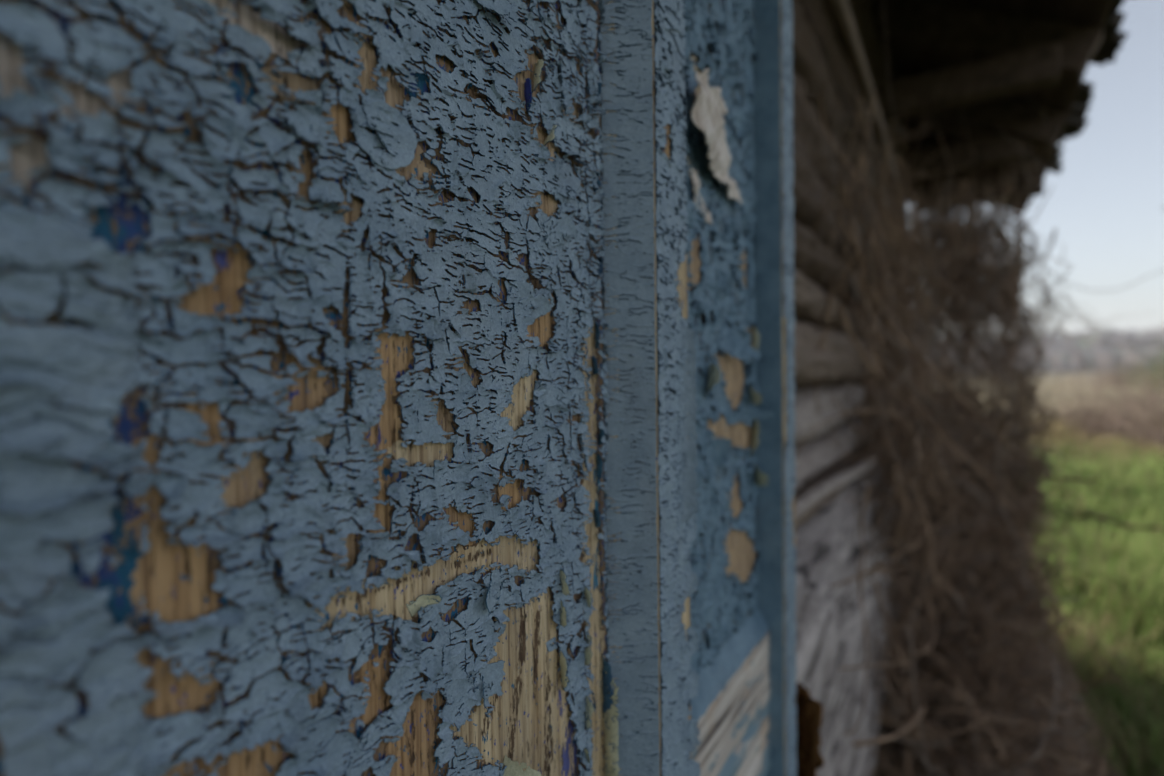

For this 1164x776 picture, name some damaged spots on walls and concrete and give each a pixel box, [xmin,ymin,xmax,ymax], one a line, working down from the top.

peeling [0,27,150,188]
peeling [75,185,276,322]
crack [175,153,279,214]
crack [248,325,335,356]
peeling [205,0,443,194]
crack [370,230,394,326]
crack [464,85,539,131]
crack [445,185,558,286]
peeling [508,48,601,253]
peeling [706,312,790,585]
peeling [62,280,620,776]
crack [360,615,406,664]